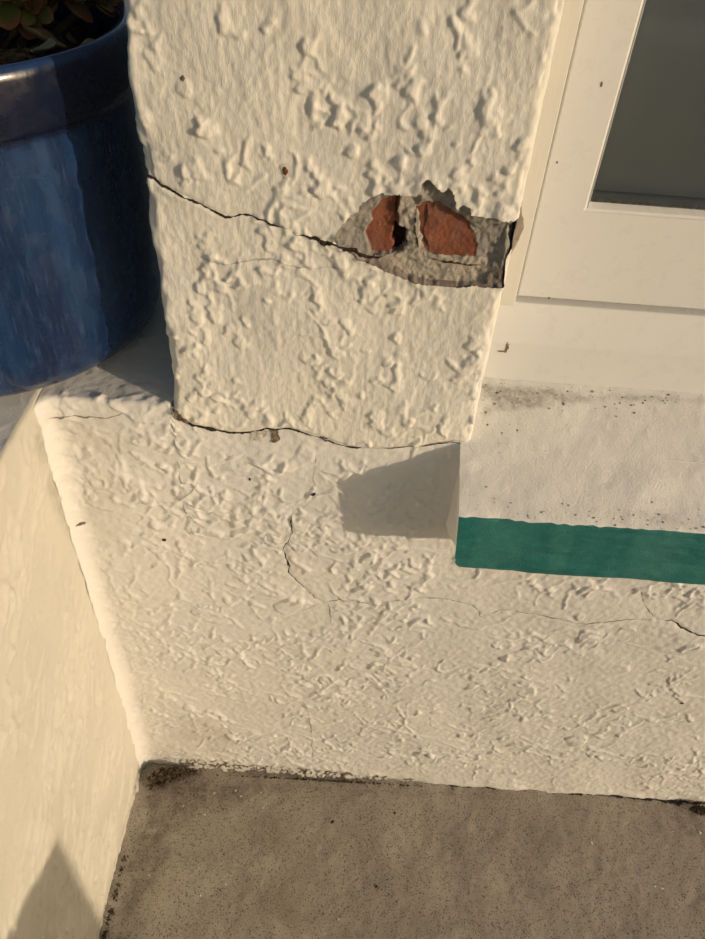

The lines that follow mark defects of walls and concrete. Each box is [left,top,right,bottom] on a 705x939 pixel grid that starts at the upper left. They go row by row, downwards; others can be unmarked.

crack [147,174,361,269]
spalling [331,180,524,289]
crack [172,400,705,636]